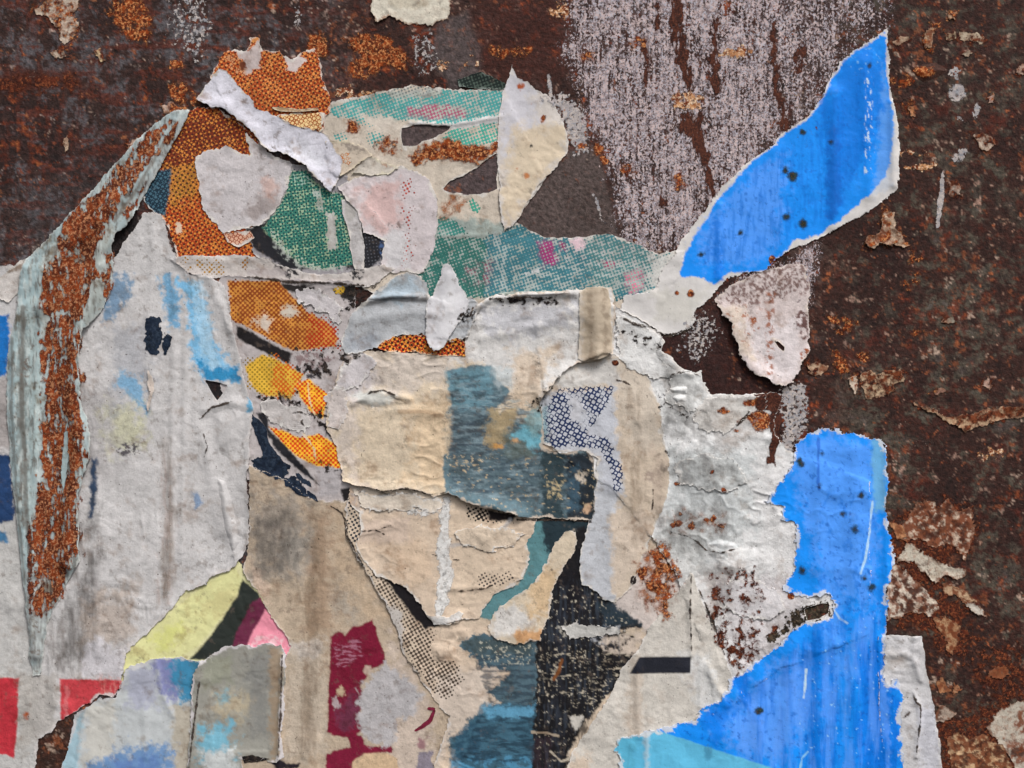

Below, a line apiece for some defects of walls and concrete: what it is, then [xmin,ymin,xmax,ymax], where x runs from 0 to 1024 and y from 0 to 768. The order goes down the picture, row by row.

rust [107,0,156,42]
rust [168,81,197,110]
rust [347,119,360,133]
rust [374,135,397,155]
rust [408,138,498,166]
peeling [540,0,988,252]
rust [900,149,938,172]
peeling [732,242,823,306]
rust [26,119,178,618]
peeling [779,357,829,451]
rust [977,447,1004,462]
rust [630,540,682,621]